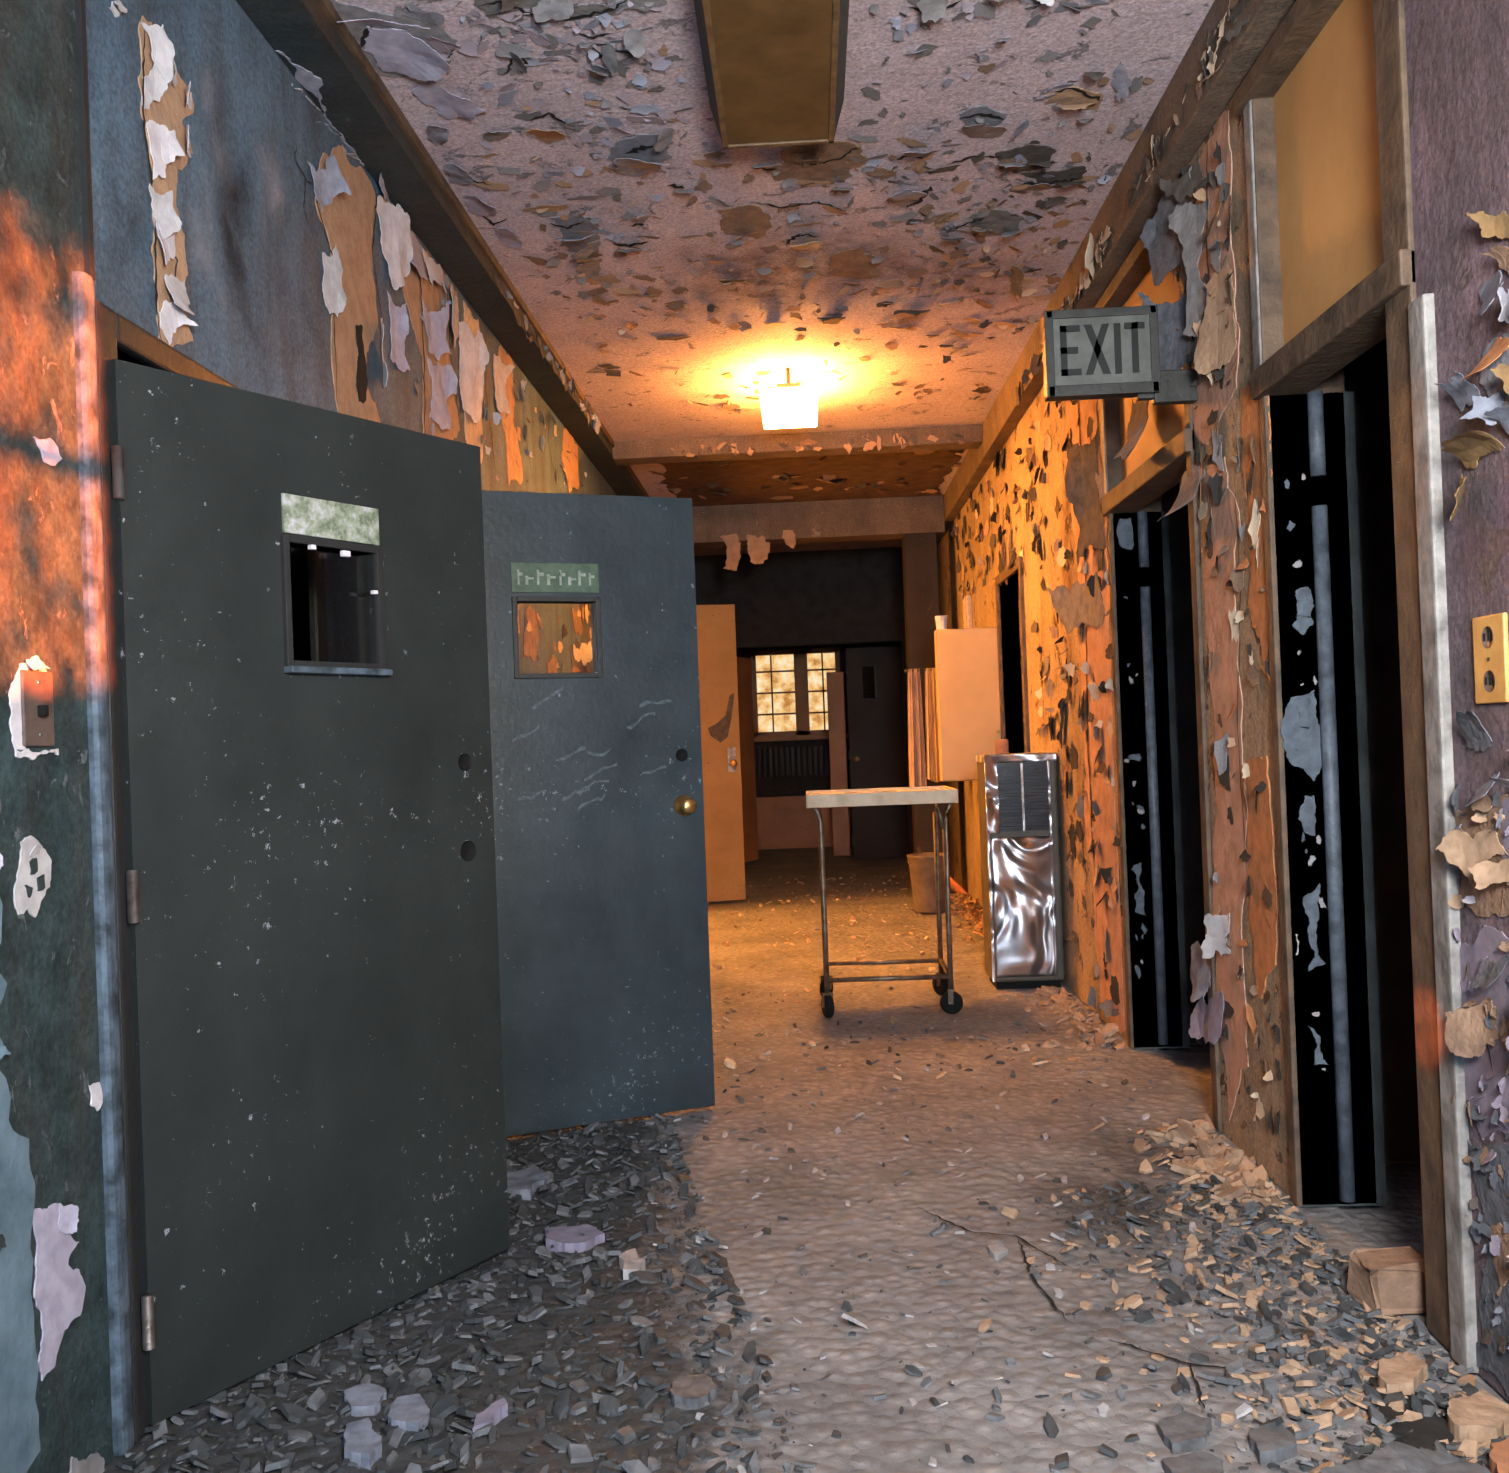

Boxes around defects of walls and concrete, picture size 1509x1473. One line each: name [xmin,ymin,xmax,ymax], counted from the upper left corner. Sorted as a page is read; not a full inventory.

peeling [108,0,198,347]
peeling [275,50,587,493]
peeling [1435,211,1509,521]
peeling [0,836,52,943]
peeling [332,0,1328,1135]
peeling [1456,711,1509,752]
peeling [0,1038,86,1473]
peeling [88,1082,103,1111]
flaking render [1436,771,1509,1398]